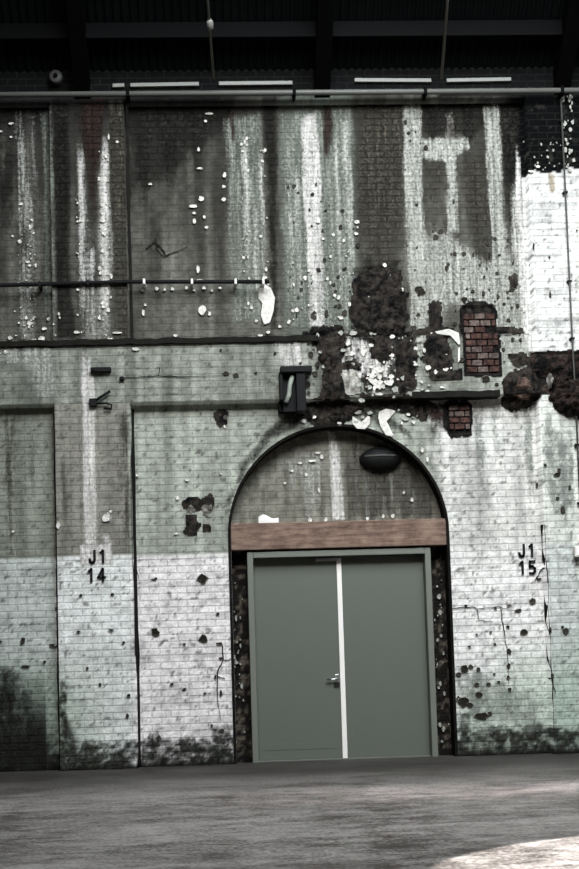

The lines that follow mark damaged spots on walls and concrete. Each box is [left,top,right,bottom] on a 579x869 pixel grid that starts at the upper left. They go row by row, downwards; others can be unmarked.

peeling [528,94,575,173]
damp [0,96,532,397]
spalling [175,493,215,535]
damp [0,670,134,771]
damp [143,726,233,765]
damp [458,674,578,756]